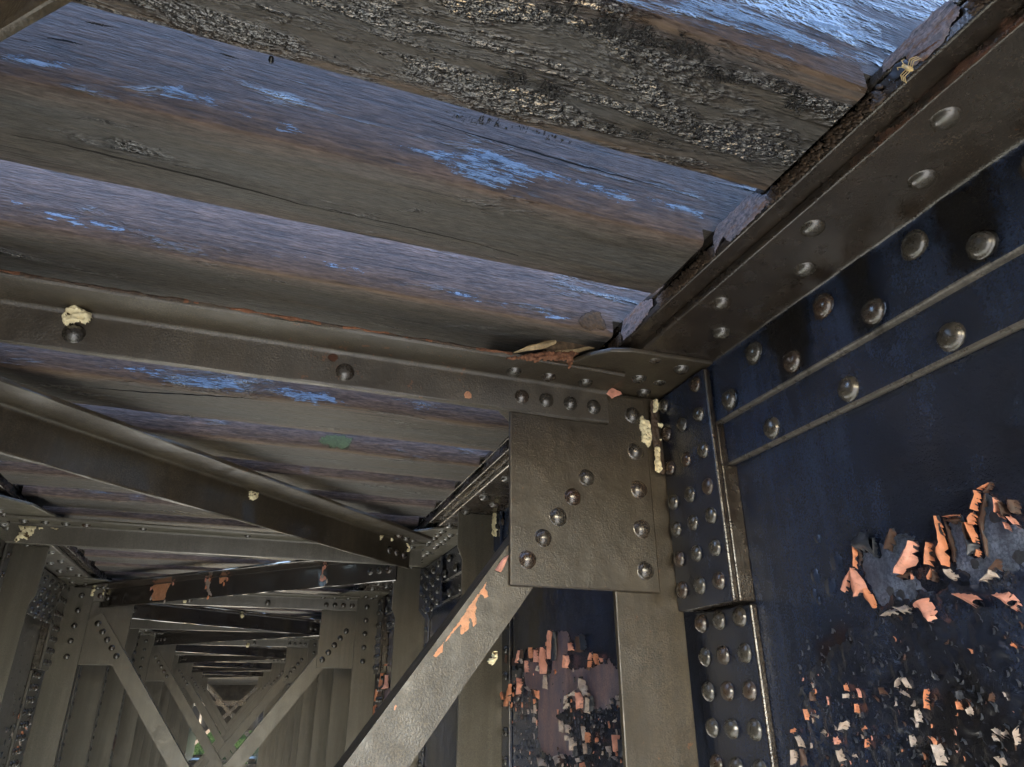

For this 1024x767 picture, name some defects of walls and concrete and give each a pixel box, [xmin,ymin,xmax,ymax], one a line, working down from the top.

corrosion [765,84,886,208]
corrosion [0,269,579,369]
peeling [150,582,174,603]
peeling [205,577,228,600]
peeling [433,582,488,657]
peeling [790,482,1024,767]
peeling [500,630,623,767]